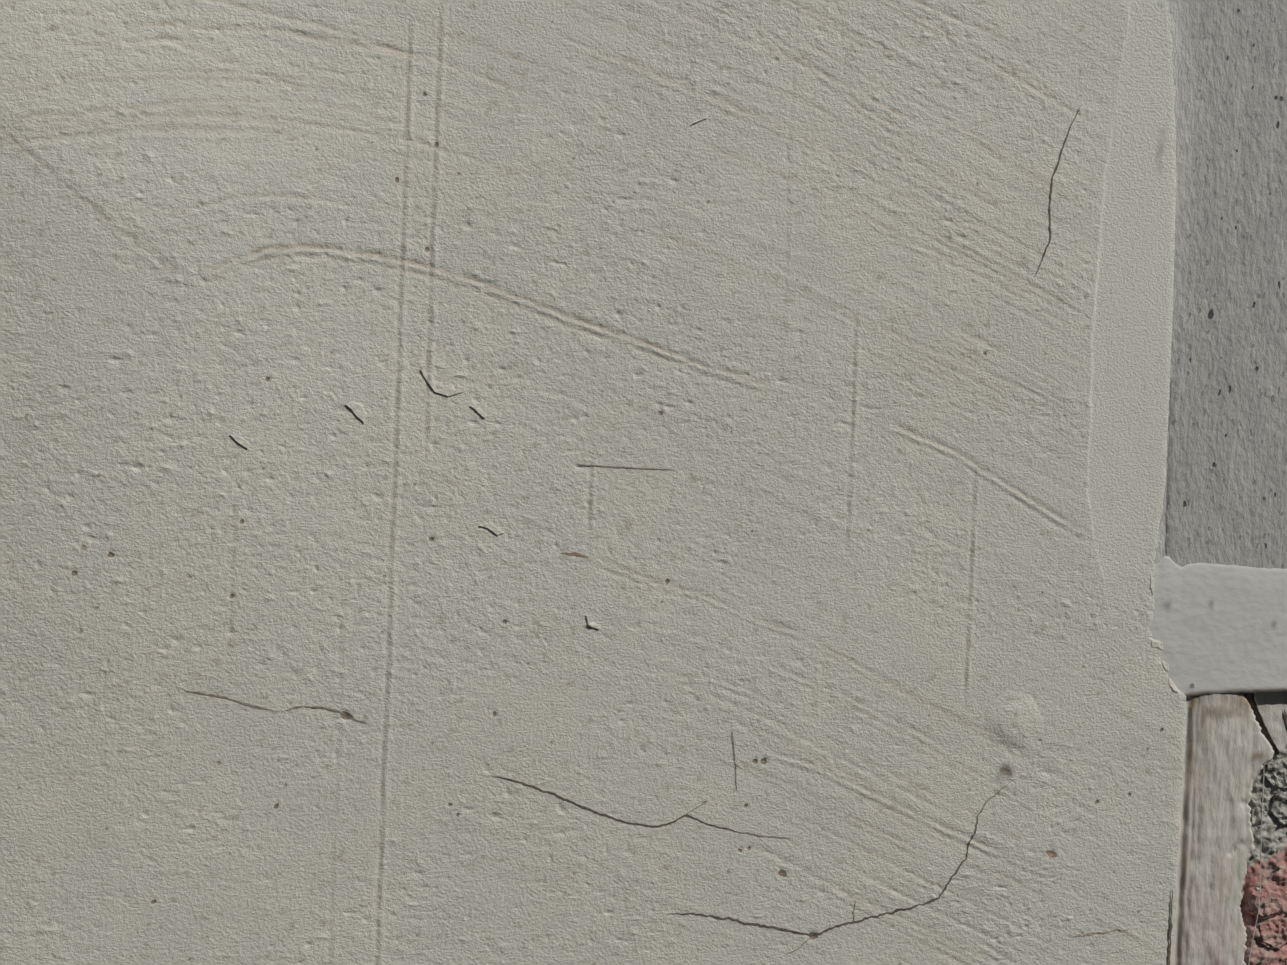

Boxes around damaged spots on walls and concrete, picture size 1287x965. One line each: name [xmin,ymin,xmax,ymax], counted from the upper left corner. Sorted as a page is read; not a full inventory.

crack [1034,106,1081,277]
crack [186,691,368,724]
peeling [1253,691,1287,753]
crack [730,733,738,788]
crack [492,776,786,838]
crack [670,782,1010,954]
peeling [1248,881,1287,965]